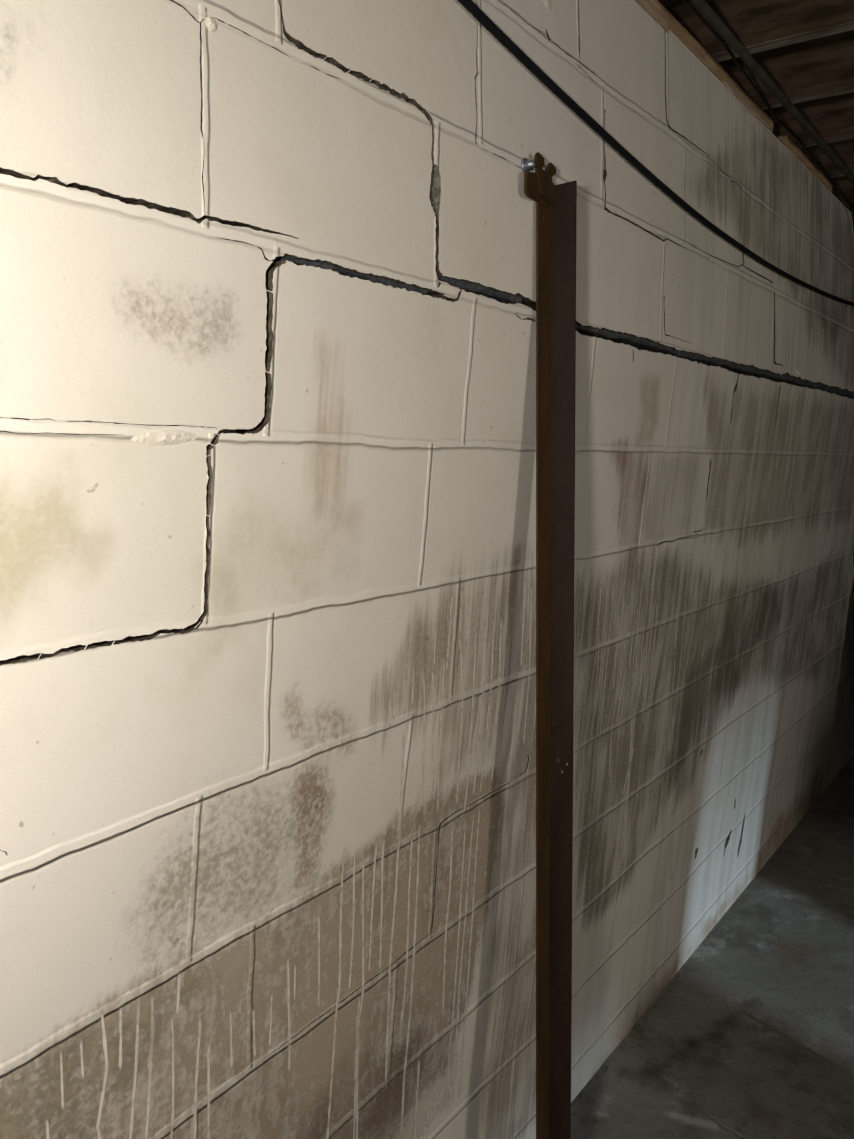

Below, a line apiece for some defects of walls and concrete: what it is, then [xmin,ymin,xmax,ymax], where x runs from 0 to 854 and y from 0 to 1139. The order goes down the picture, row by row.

crack [0,0,536,665]
crack [475,0,596,169]
crack [664,31,742,189]
crack [576,110,854,426]
crack [657,460,711,546]
water stain [0,572,536,1139]
crack [270,754,529,1055]
water stain [574,556,775,916]